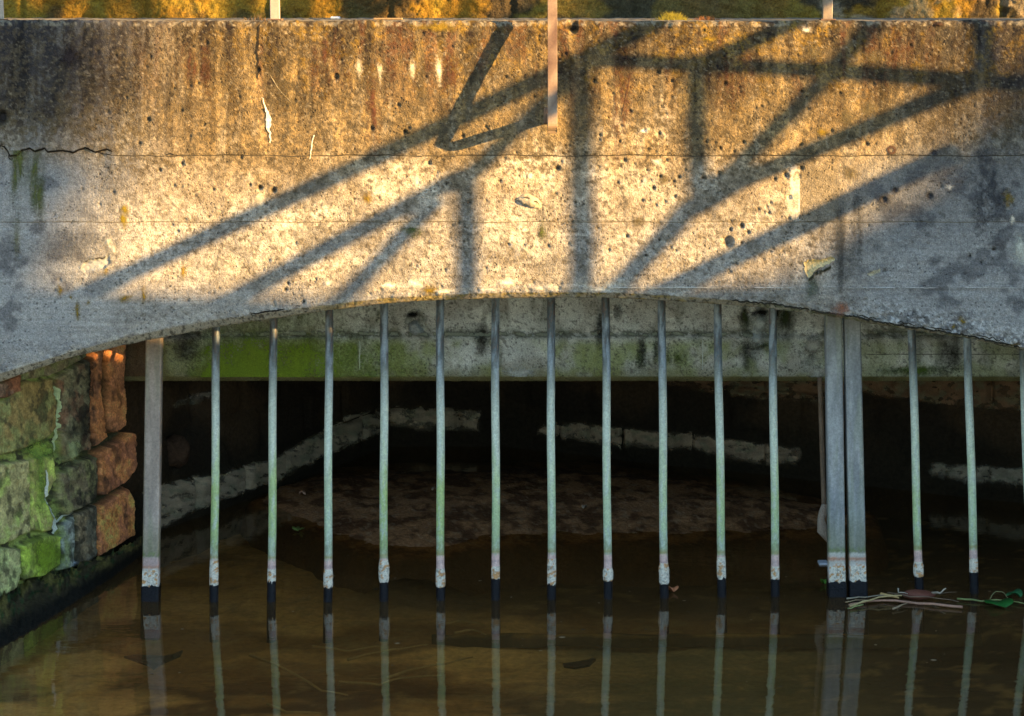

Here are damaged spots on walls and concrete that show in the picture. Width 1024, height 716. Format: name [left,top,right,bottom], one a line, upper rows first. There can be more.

crack [0,145,1024,160]
leakage [478,325,486,353]
leakage [638,339,657,366]
leakage [52,386,62,450]
leakage [44,470,73,534]